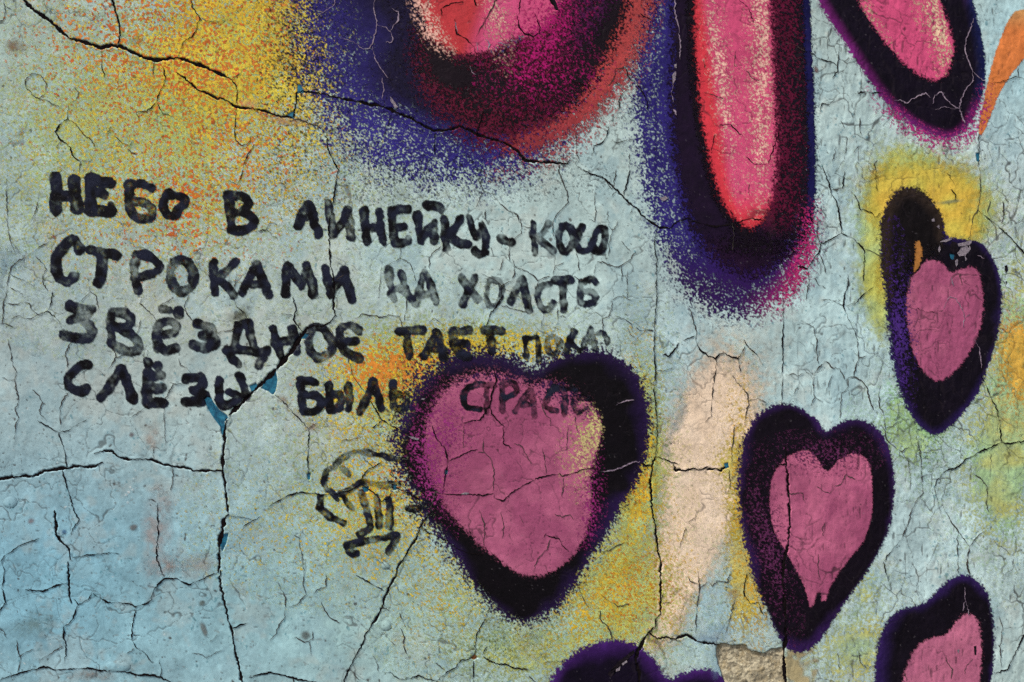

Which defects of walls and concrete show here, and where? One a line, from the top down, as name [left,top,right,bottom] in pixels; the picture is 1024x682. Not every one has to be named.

peeling [205,397,228,435]
peeling [250,372,278,394]
crack [0,0,765,682]
crack [776,445,854,682]